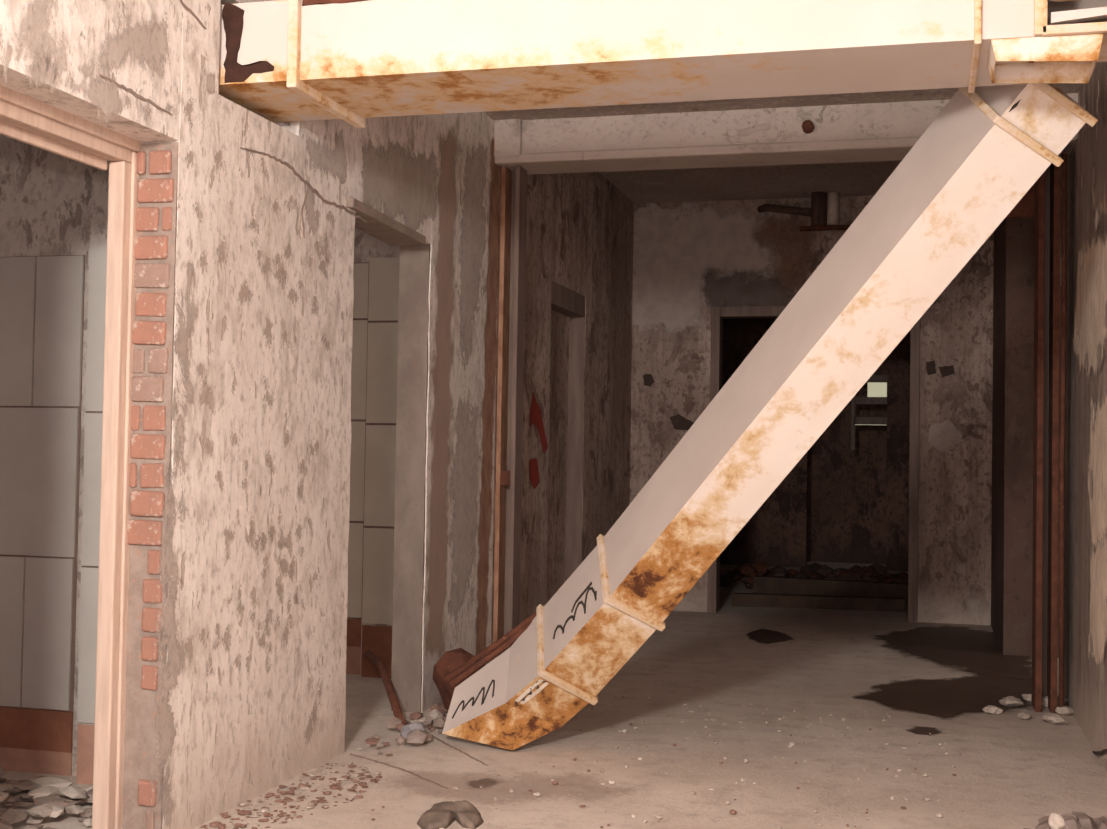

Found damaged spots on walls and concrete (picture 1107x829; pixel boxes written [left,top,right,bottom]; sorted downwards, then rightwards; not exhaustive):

crack [179,0,206,30]
corrosion [222,2,274,83]
crack [99,74,172,116]
peeling [166,99,194,127]
crack [240,147,367,238]
peeling [257,243,318,315]
peeling [263,318,287,349]
flaking render [122,142,253,829]
peeling [298,441,319,498]
peeling [224,510,305,651]
water stain [854,626,1033,718]
peeling [305,686,321,743]